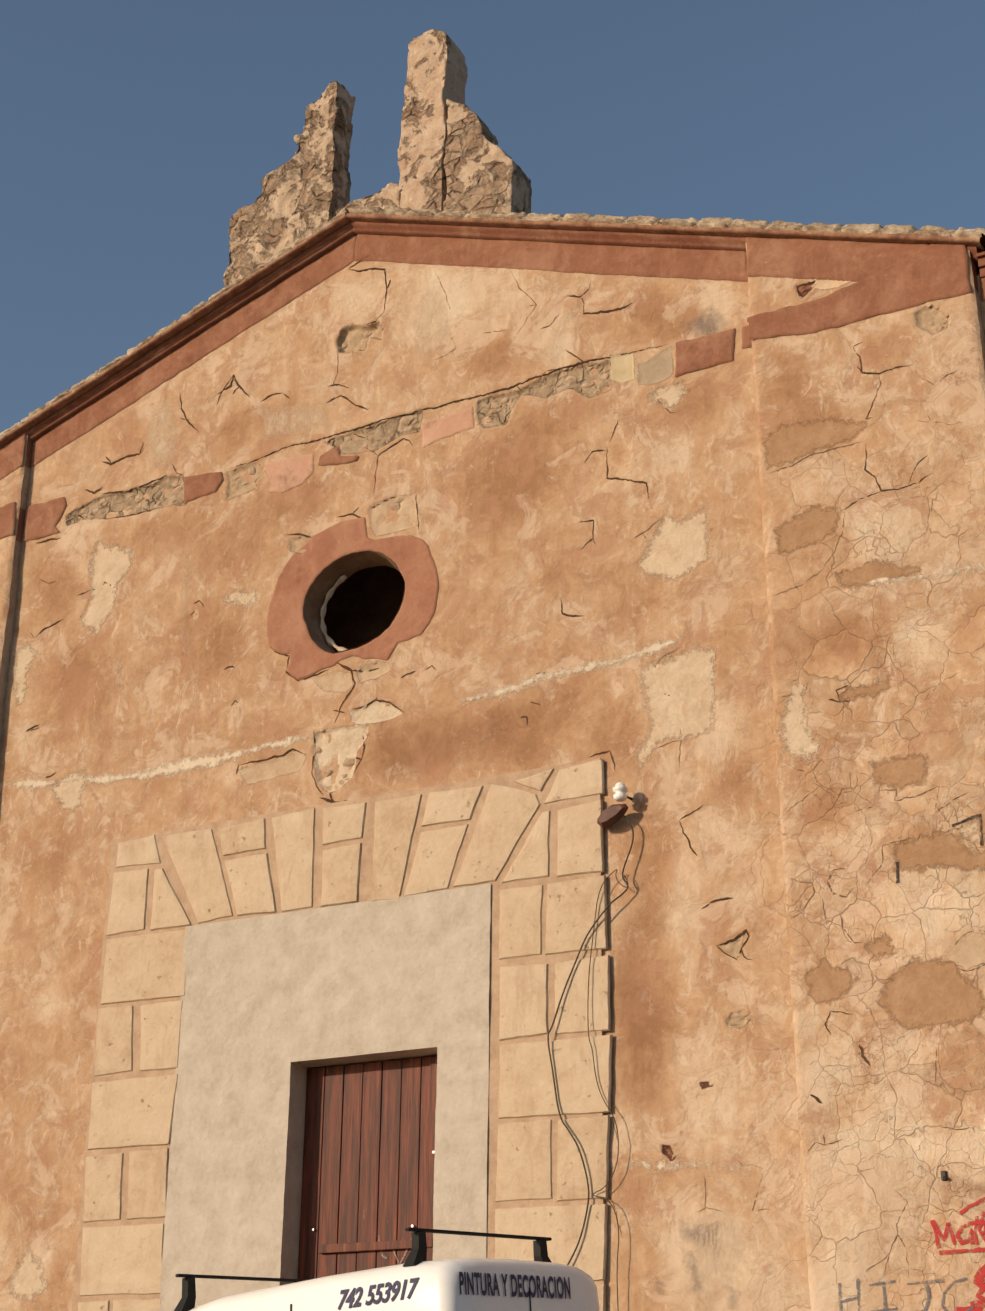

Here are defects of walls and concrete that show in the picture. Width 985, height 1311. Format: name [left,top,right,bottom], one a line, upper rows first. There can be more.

crack [349,261,391,324]
crack [217,375,289,404]
crack [232,274,666,540]
spalling [325,409,423,454]
crack [771,342,957,595]
spalling [66,475,187,526]
spalling [369,493,418,536]
spalling [313,660,390,693]
spalling [239,701,402,792]
crack [679,807,701,855]
crack [702,897,732,909]
crack [716,929,752,960]